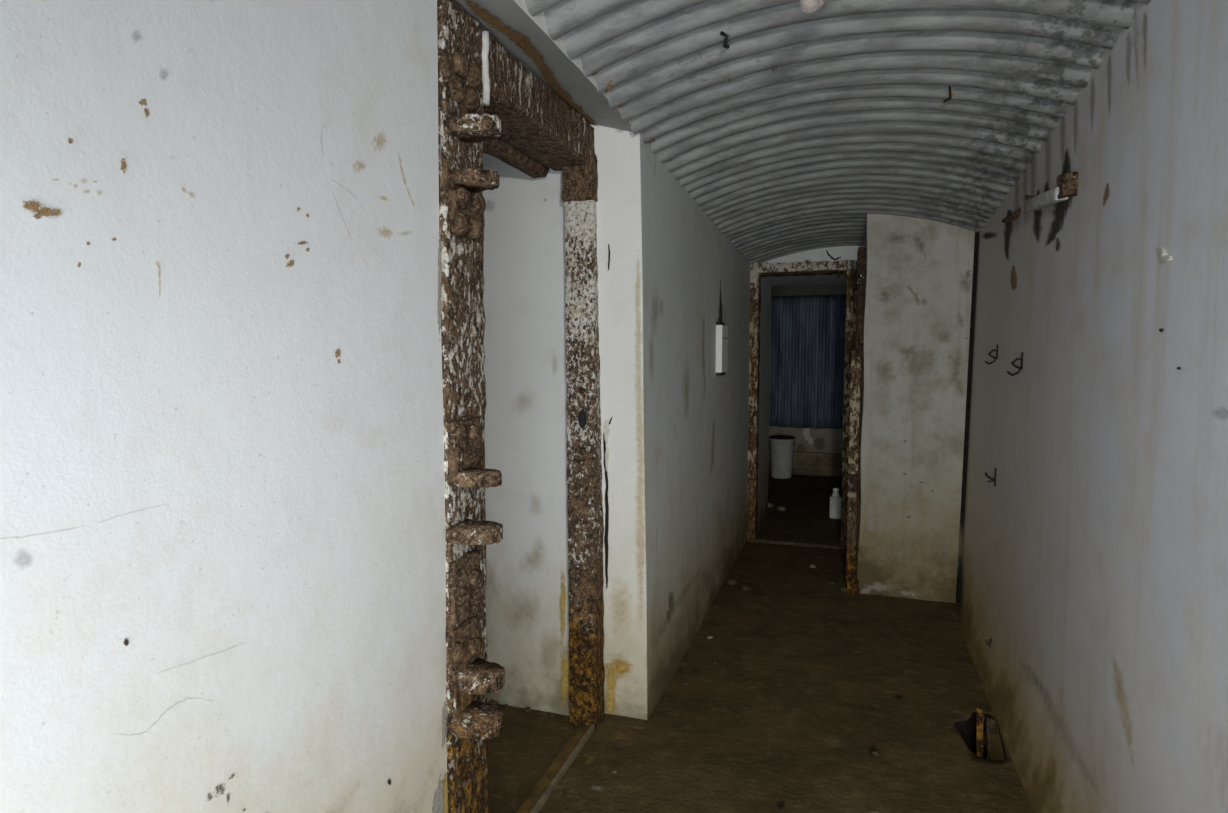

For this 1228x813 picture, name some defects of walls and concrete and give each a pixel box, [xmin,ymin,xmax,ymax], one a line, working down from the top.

rust [465,1,597,126]
rust [23,201,61,219]
rust [561,653,569,701]
rust [606,661,629,712]
leakage [207,774,234,803]